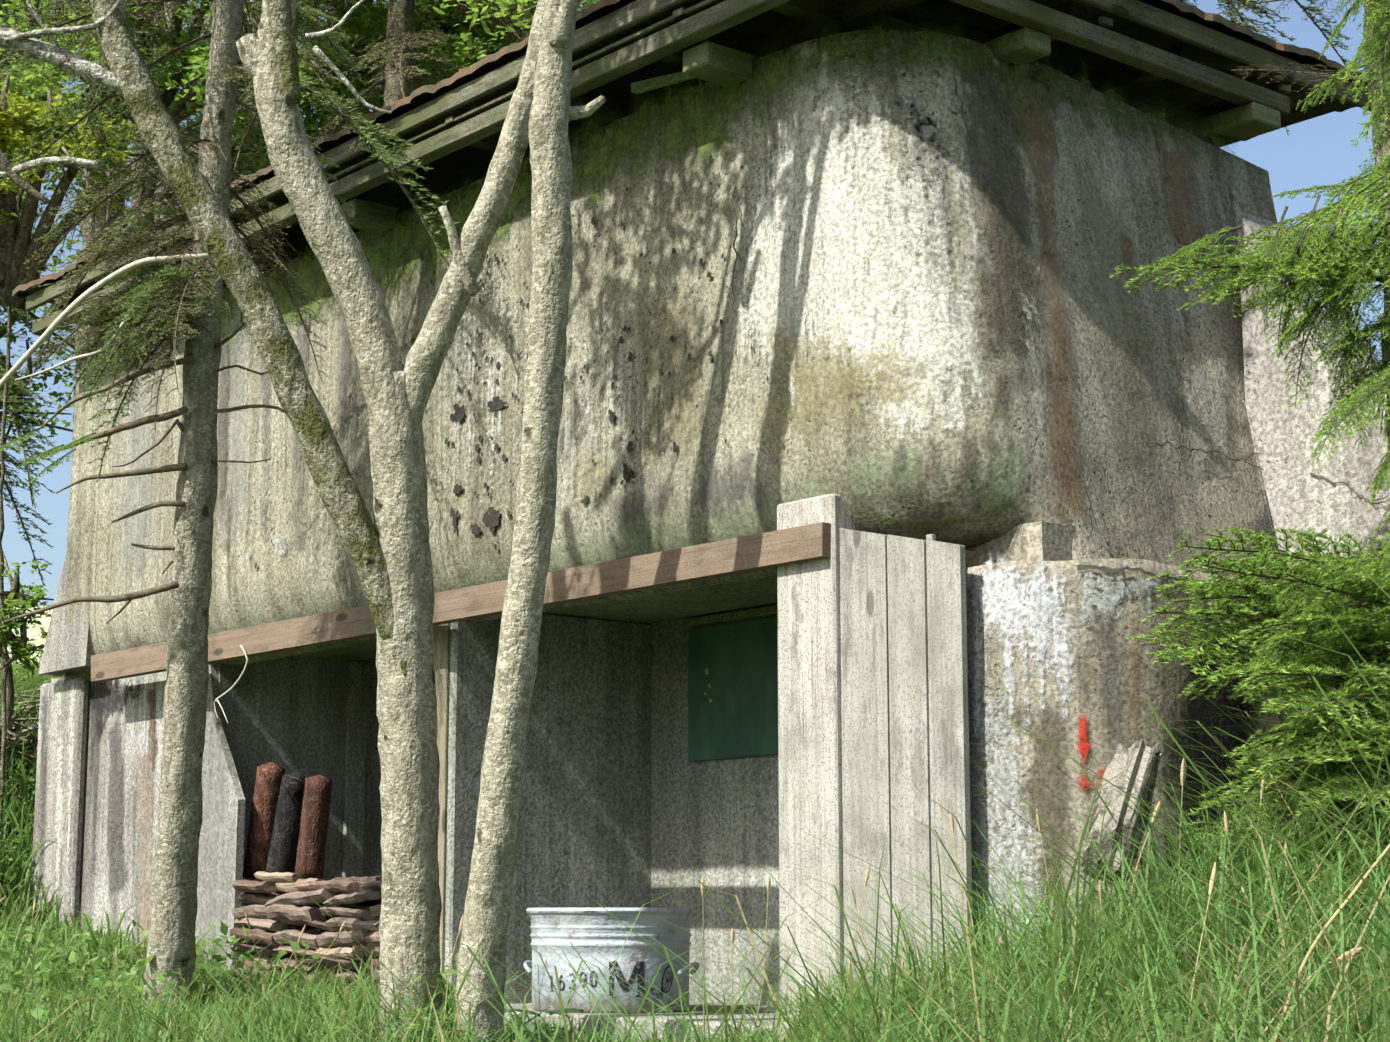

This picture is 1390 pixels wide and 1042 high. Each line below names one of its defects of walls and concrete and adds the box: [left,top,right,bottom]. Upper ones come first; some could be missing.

water stain [445,327,527,480]
water stain [555,298,685,529]
water stain [687,451,763,515]
water stain [735,55,1040,532]
crack [1156,441,1264,470]
water stain [38,673,140,908]
water stain [969,558,1160,959]